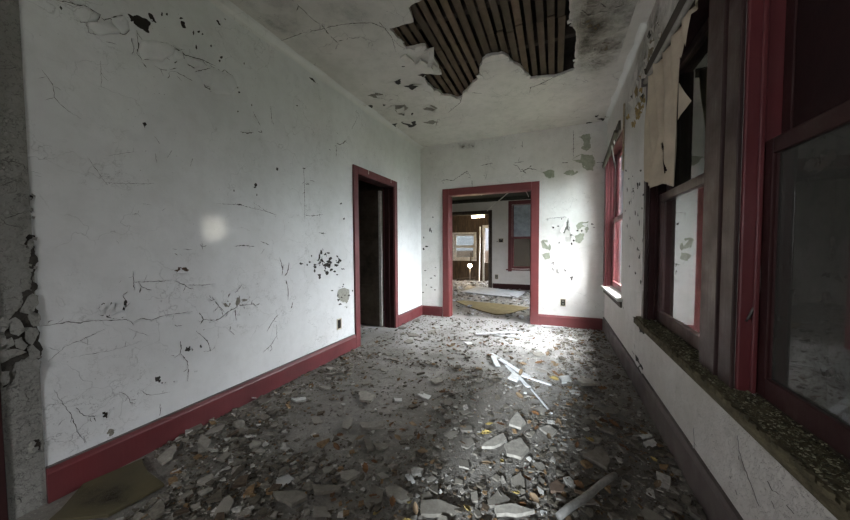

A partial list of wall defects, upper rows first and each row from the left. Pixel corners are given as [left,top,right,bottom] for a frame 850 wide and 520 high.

flaking render [120,12,168,33]
flaking render [388,0,578,97]
peeling [626,21,662,128]
peeling [363,93,438,127]
peeling [536,134,596,178]
peeling [560,217,589,243]
peeling [299,250,344,279]
flaking render [0,234,43,388]
crack [39,241,293,416]
crack [56,392,96,452]